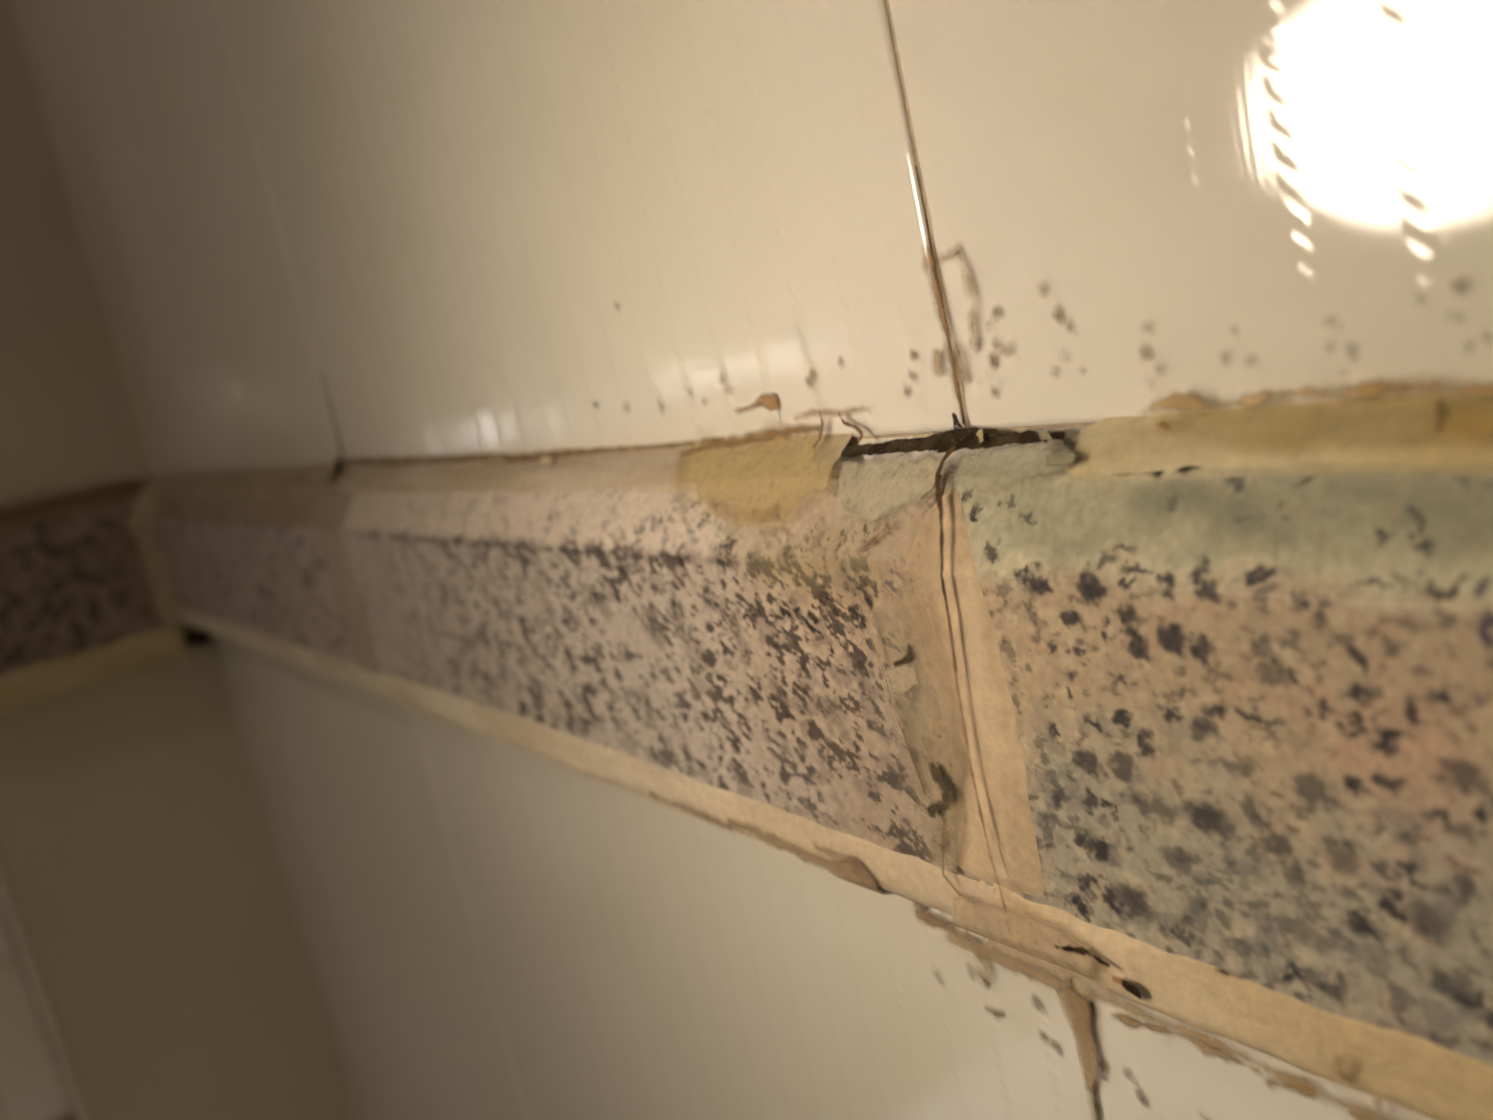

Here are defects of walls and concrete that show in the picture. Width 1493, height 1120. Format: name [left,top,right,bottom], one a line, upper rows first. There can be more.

damp [1148,393,1206,429]
damp [1238,381,1493,430]
damp [680,426,826,522]
crack [812,166,1074,911]
spalling [838,429,1075,548]
damp [1153,466,1200,476]
peeling [866,526,974,904]
damp [650,792,894,895]
damp [914,896,1389,1120]